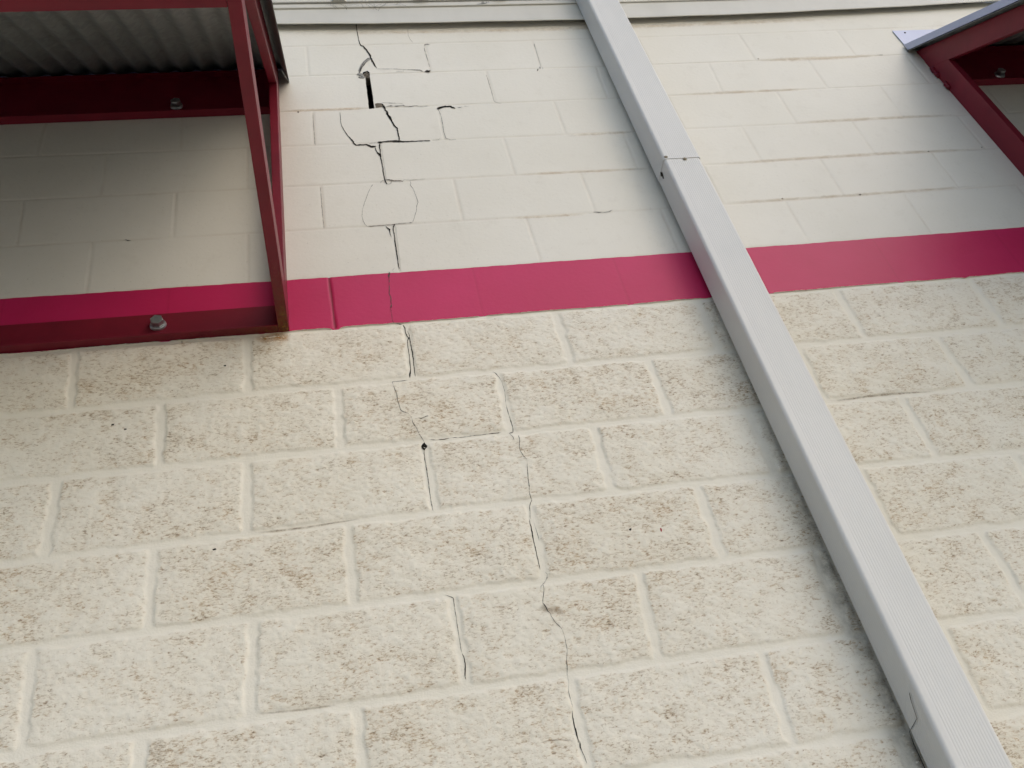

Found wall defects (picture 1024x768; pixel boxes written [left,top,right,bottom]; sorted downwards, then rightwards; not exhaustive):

crack [356,25,430,73]
crack [340,103,587,763]